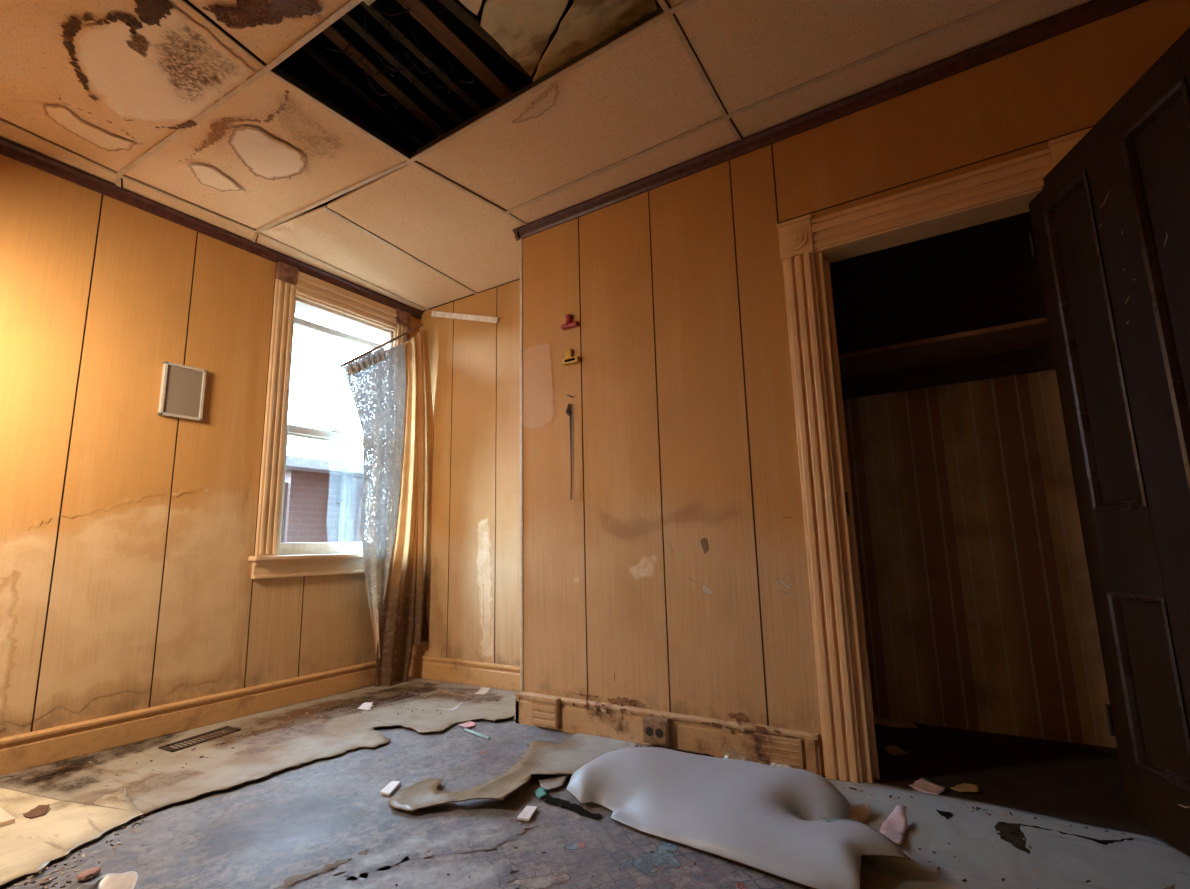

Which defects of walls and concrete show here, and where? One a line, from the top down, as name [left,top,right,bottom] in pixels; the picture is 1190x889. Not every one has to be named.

damp [42,0,322,192]
damp [0,484,256,731]